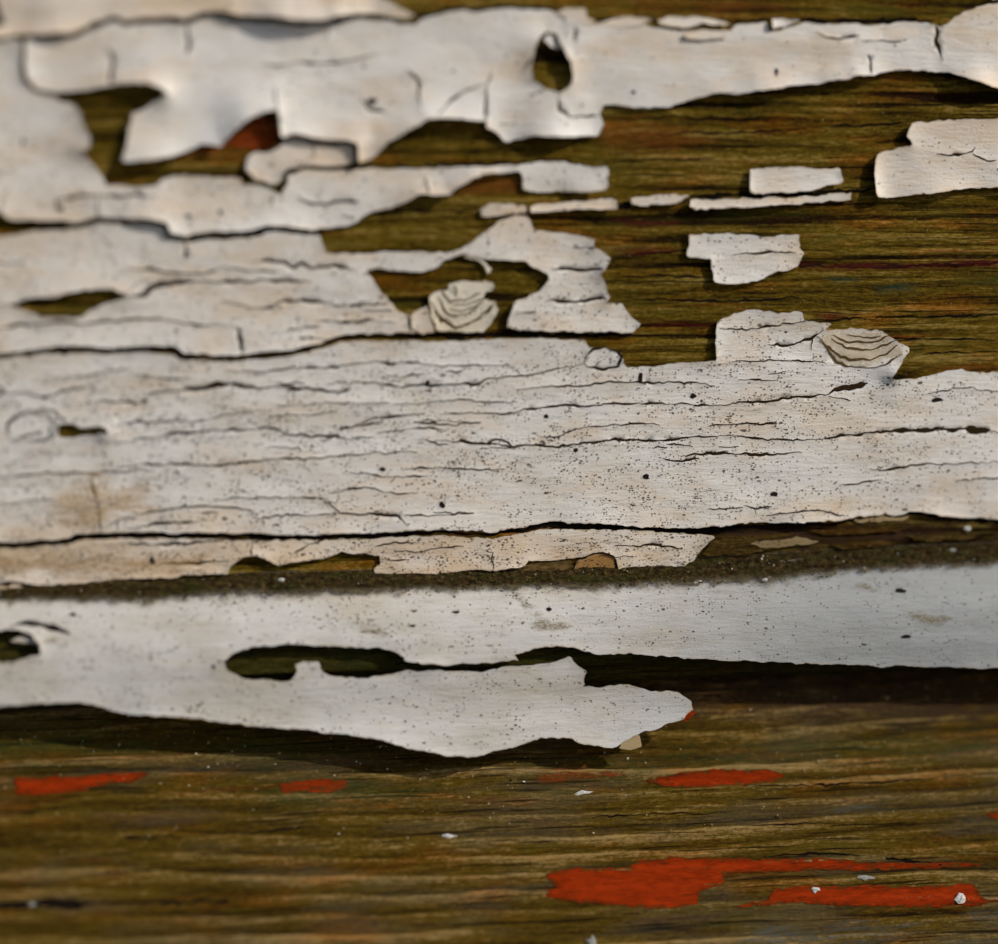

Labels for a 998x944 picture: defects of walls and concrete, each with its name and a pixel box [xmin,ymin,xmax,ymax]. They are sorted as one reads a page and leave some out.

crack [22,45,59,97]
crack [91,3,551,85]
crack [573,16,658,42]
crack [733,17,943,74]
peeling [0,0,998,589]
crack [0,54,998,581]
peeling [0,561,998,758]